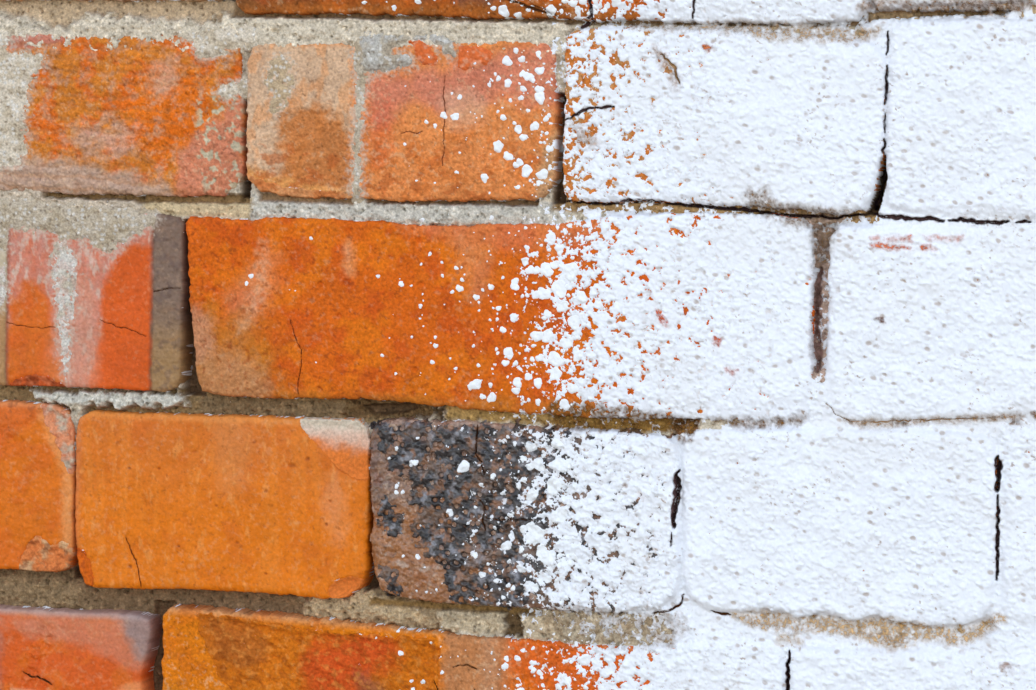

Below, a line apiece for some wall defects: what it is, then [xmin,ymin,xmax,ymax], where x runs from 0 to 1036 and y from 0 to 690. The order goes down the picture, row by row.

crack [509,0,555,15]
crack [581,0,595,29]
crack [670,470,682,546]
crack [994,457,1002,580]
crack [784,651,792,690]